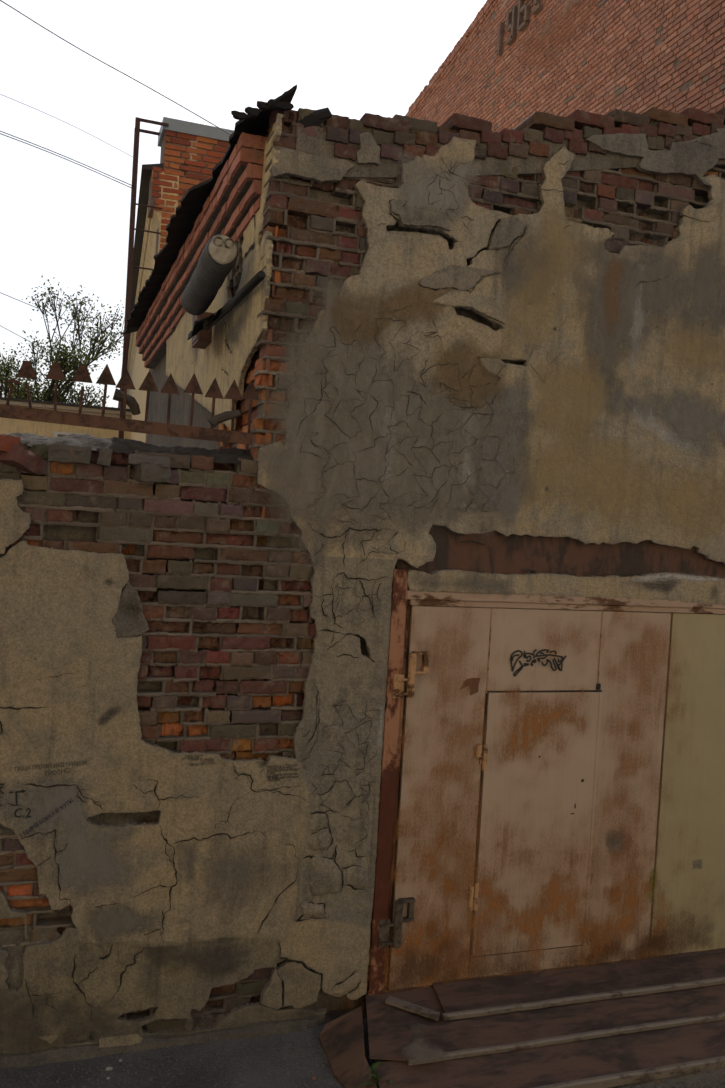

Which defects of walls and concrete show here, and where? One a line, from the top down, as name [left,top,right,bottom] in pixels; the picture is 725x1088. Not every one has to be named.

crack [376,158,475,233]
spalling [466,163,544,224]
spalling [561,156,725,253]
damp [580,243,725,451]
spalling [0,108,459,762]
crack [298,228,527,658]
crack [0,536,27,558]
corrosion [499,689,585,760]
crack [0,783,102,809]
spalling [0,823,74,949]
crack [23,680,383,1024]
spalling [120,961,284,1032]